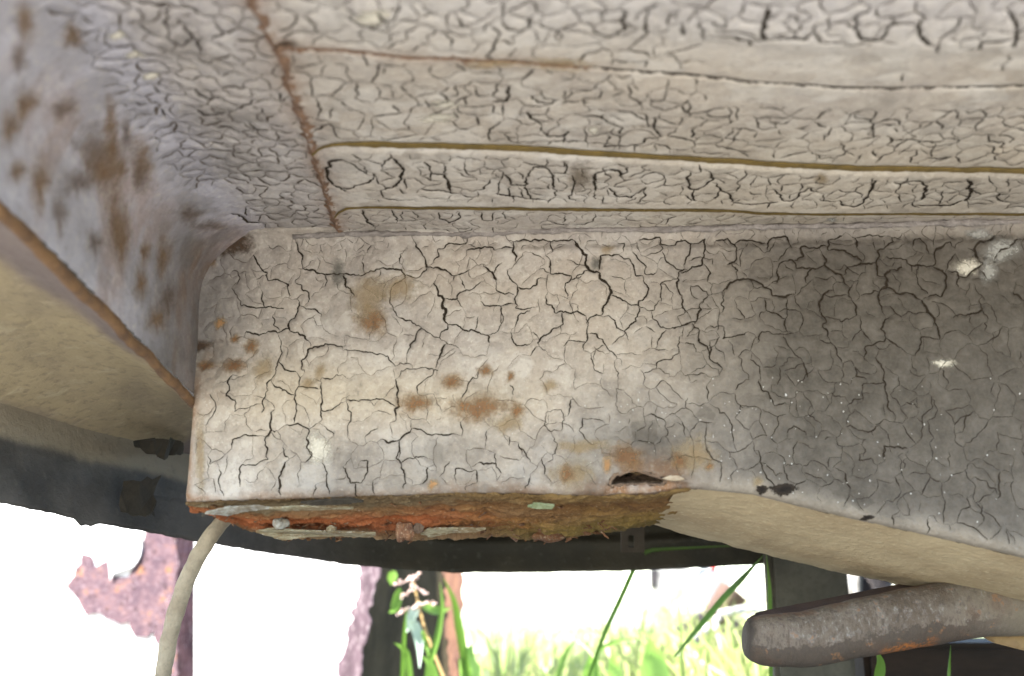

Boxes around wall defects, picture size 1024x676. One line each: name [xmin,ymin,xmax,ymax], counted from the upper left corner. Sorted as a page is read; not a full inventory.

crack [41,0,1024,545]
rust [361,279,411,331]
rust [442,375,460,388]
rust [398,395,431,412]
rust [456,395,523,429]
peeling [205,505,354,516]
peeling [256,528,376,541]
rust [396,522,424,543]
peeling [420,527,486,538]
rust [532,532,565,543]